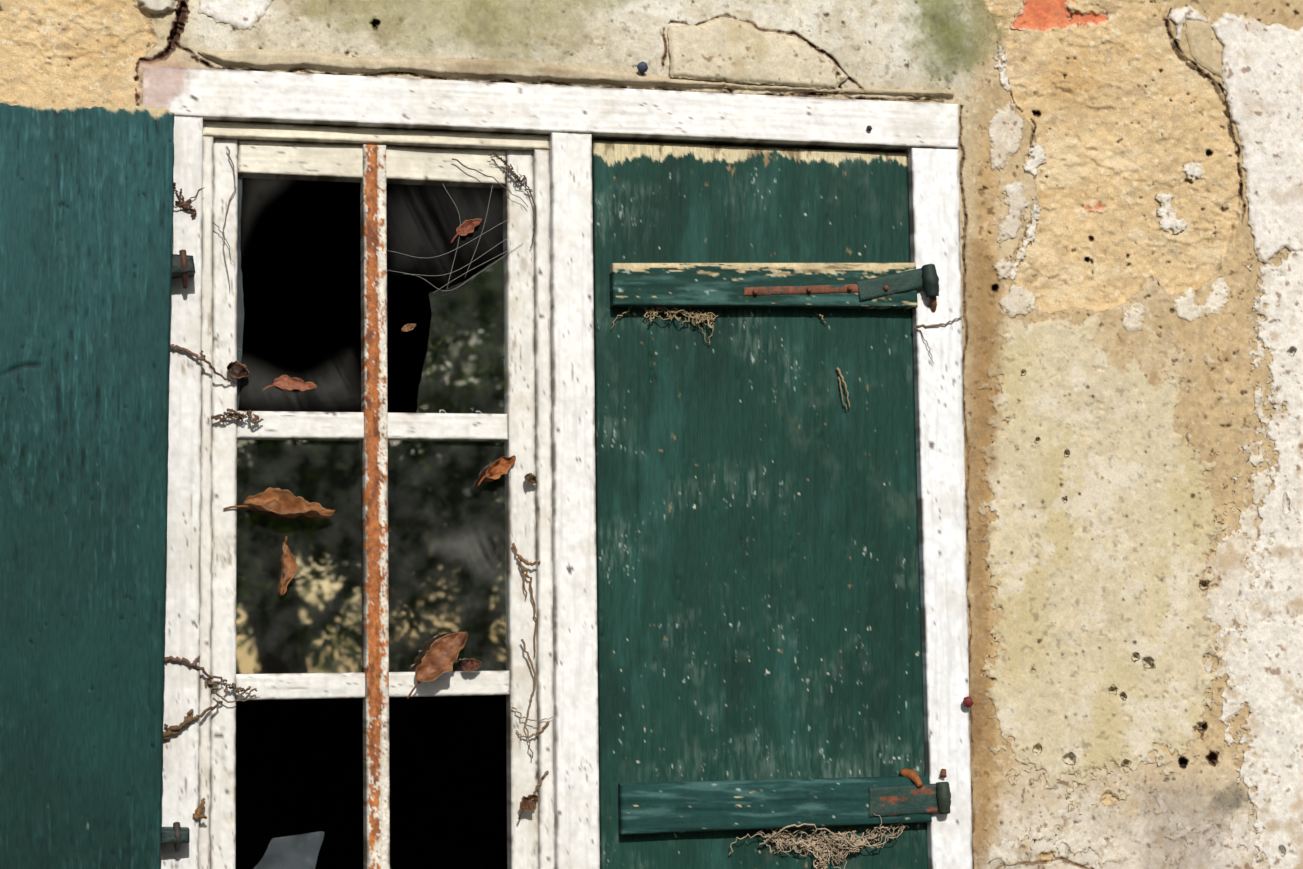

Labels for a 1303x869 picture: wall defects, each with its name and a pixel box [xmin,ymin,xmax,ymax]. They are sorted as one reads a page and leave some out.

flaking render [0,0,179,109]
peeling [198,0,273,30]
crack [1164,8,1246,225]
crack [134,0,1094,869]
peeling [974,0,1303,869]